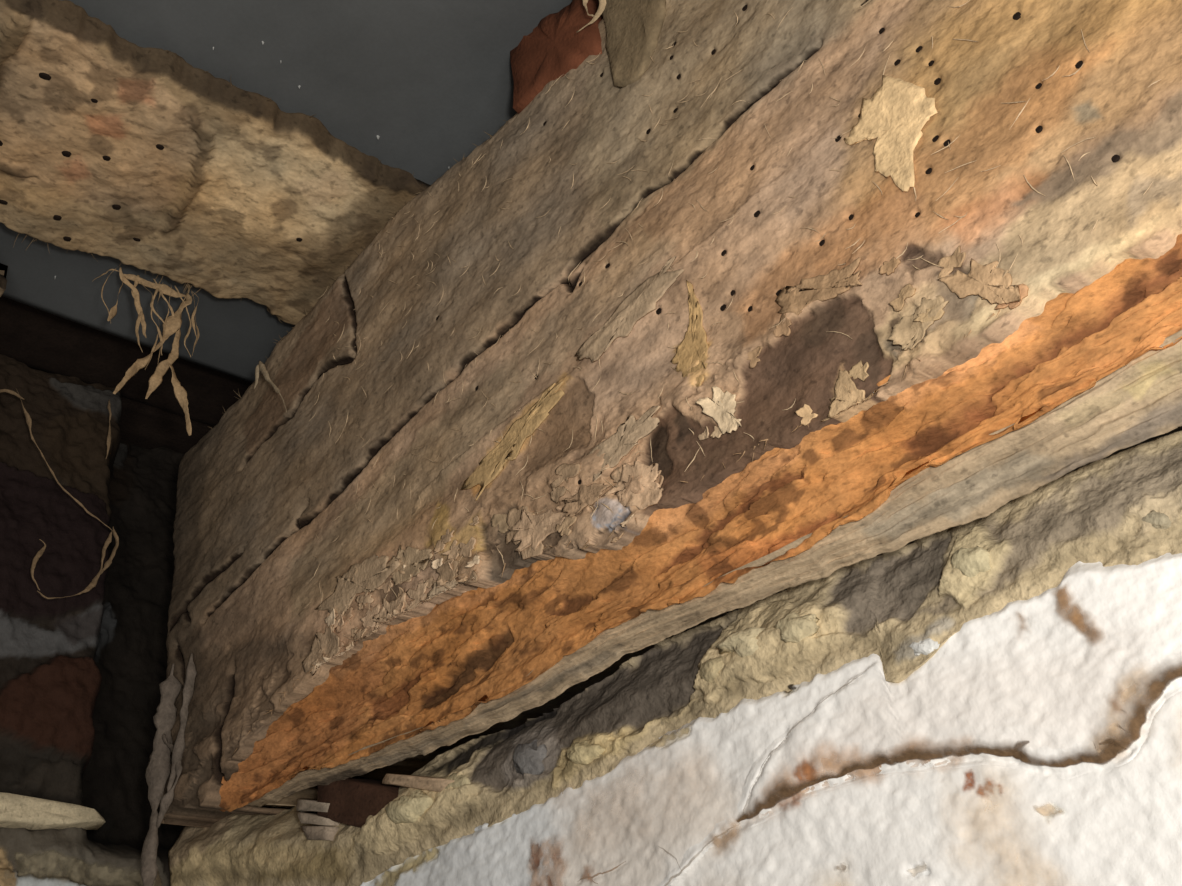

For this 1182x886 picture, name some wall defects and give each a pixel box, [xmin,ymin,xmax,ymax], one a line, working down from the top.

peeling [844,75,938,192]
crack [170,49,819,684]
peeling [461,381,565,501]
peeling [575,256,742,441]
peeling [773,257,862,337]
peeling [795,361,877,426]
peeling [888,245,1029,351]
peeling [302,406,664,676]
crack [213,675,235,785]
crack [712,664,1182,841]